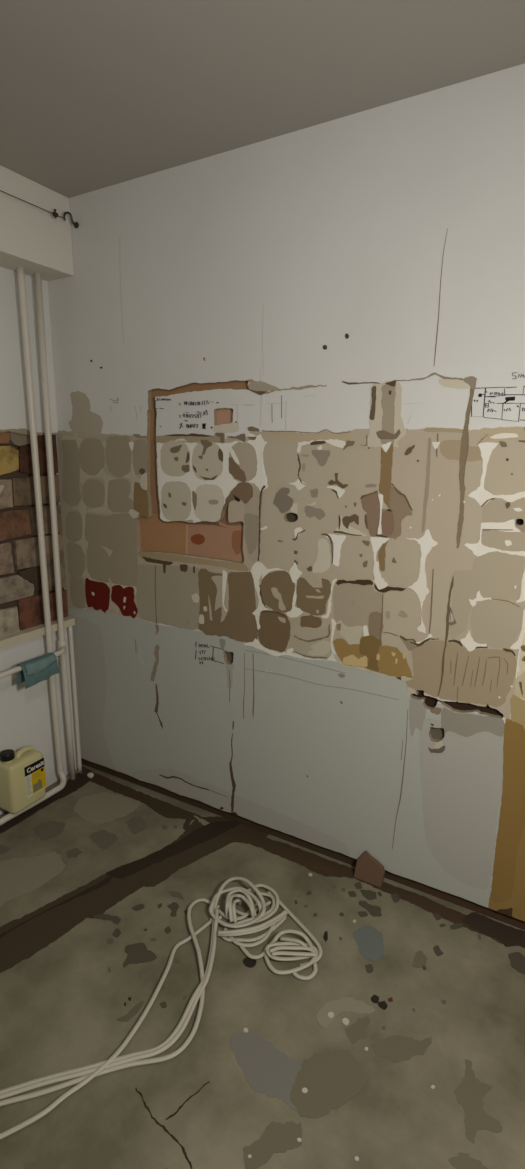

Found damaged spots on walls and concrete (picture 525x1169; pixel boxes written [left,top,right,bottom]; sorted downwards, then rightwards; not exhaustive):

crack [167,431,210,439]
crack [246,228,511,548]
flaking render [438,376,477,390]
peeling [0,381,525,719]
crack [233,486,330,658]
crack [262,429,523,849]
crack [159,653,254,812]
crack [136,1081,210,1169]